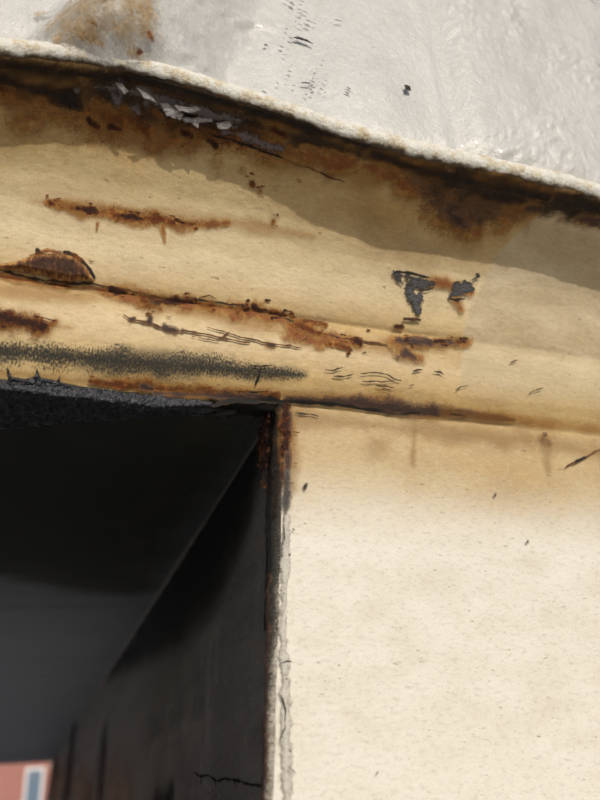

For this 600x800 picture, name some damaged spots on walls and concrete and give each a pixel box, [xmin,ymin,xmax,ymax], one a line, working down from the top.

rust [34,0,159,59]
peeling [116,82,233,130]
rust [0,58,600,243]
spalling [392,270,480,315]
rust [0,308,58,341]
crack [565,449,600,468]
rust [88,375,299,680]
crack [194,772,261,788]